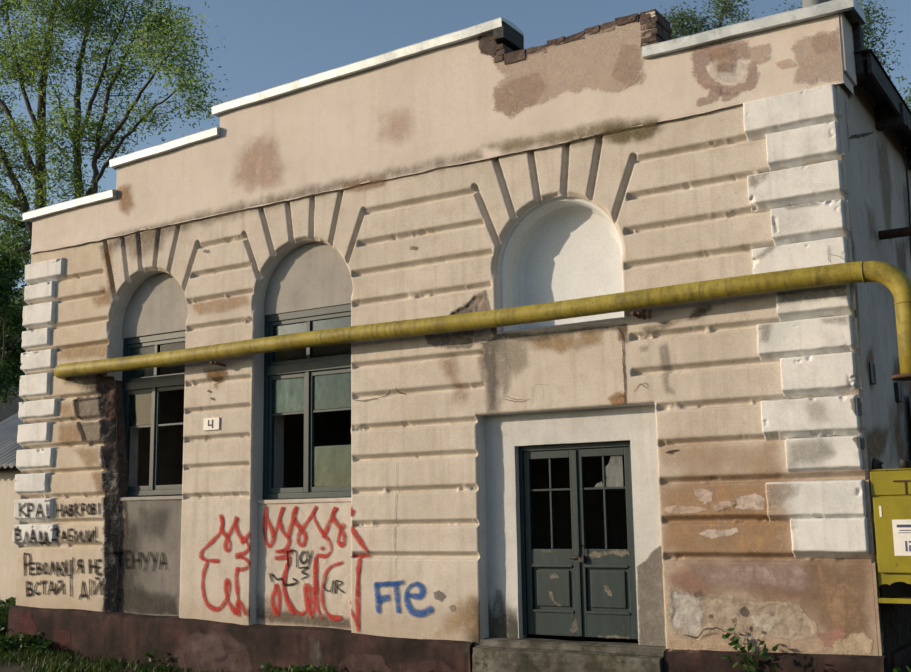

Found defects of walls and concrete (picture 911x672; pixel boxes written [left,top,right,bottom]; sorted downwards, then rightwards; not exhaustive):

peeling [478,13,651,117]
peeling [692,40,770,106]
damp [491,121,657,150]
crack [846,109,873,139]
damp [103,175,384,254]
damp [879,143,891,230]
flaking render [424,327,500,349]
flaking render [450,291,490,315]
damp [479,335,524,410]
crack [616,327,649,404]
flaking render [72,377,128,613]
flaking render [666,587,872,654]